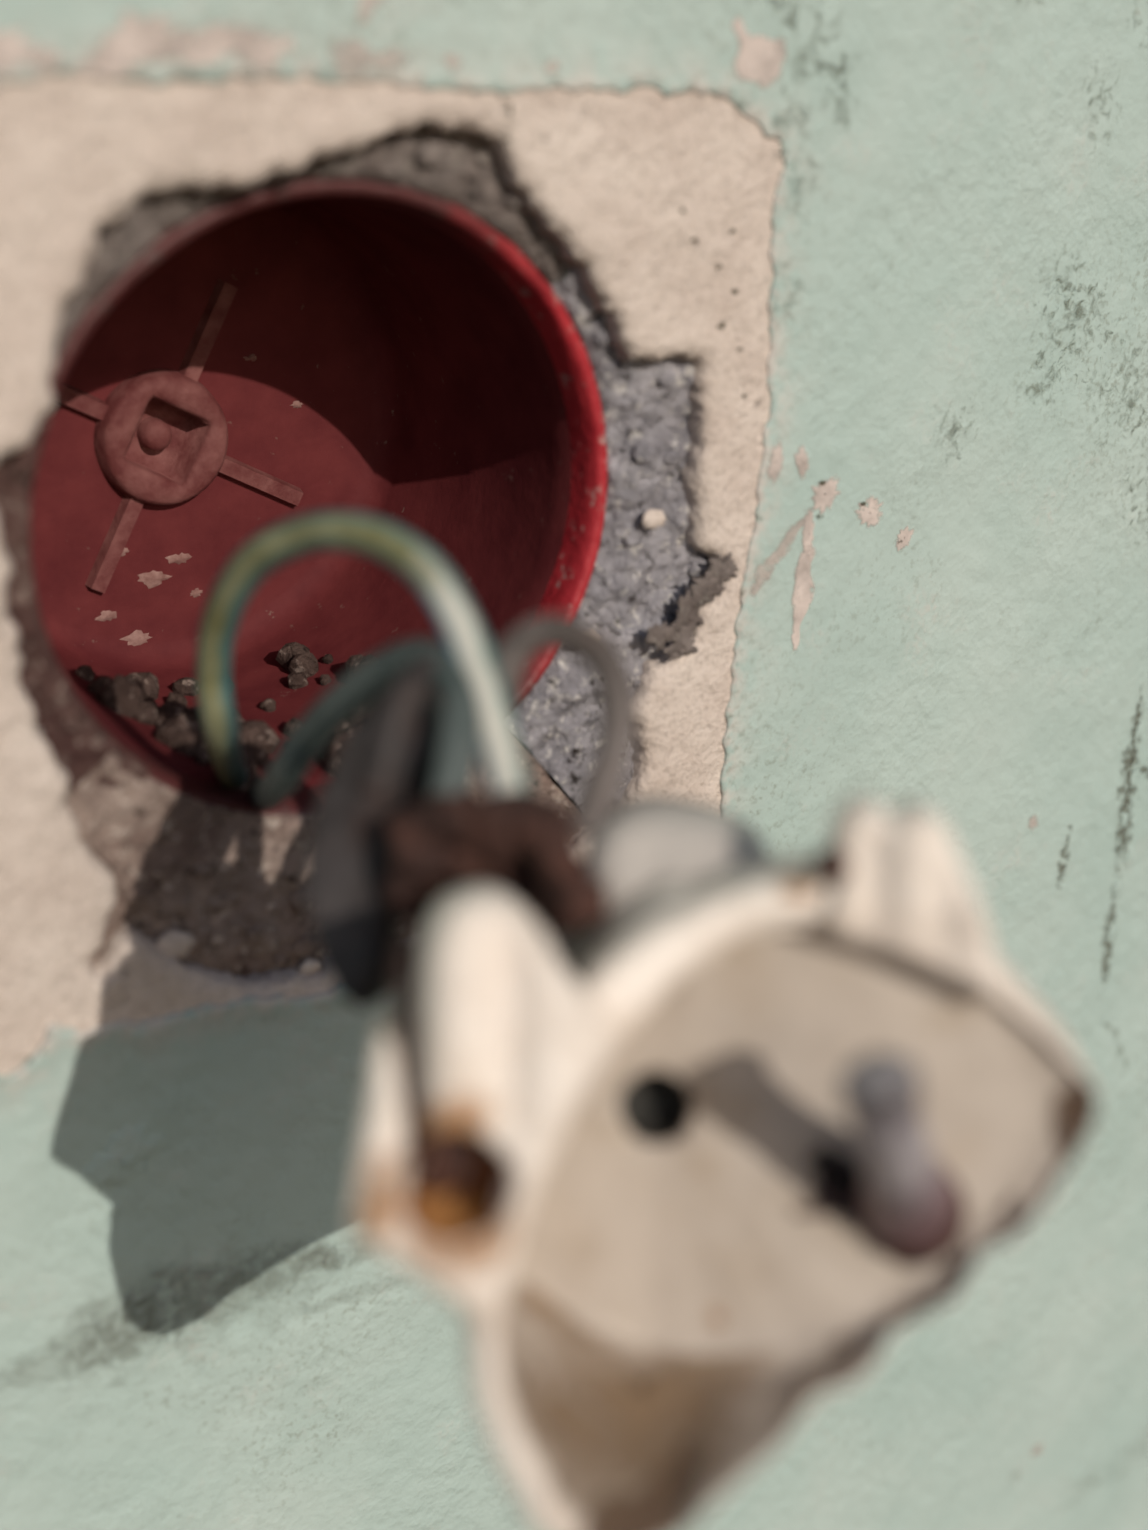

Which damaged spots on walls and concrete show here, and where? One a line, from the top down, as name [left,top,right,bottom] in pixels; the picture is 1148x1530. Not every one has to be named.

peeling [733,17,786,89]
spalling [55,125,840,690]
peeling [856,497,882,527]
spalling [0,397,323,977]
spalling [513,650,599,835]
crack [1057,825,1072,887]
crack [1102,695,1148,983]